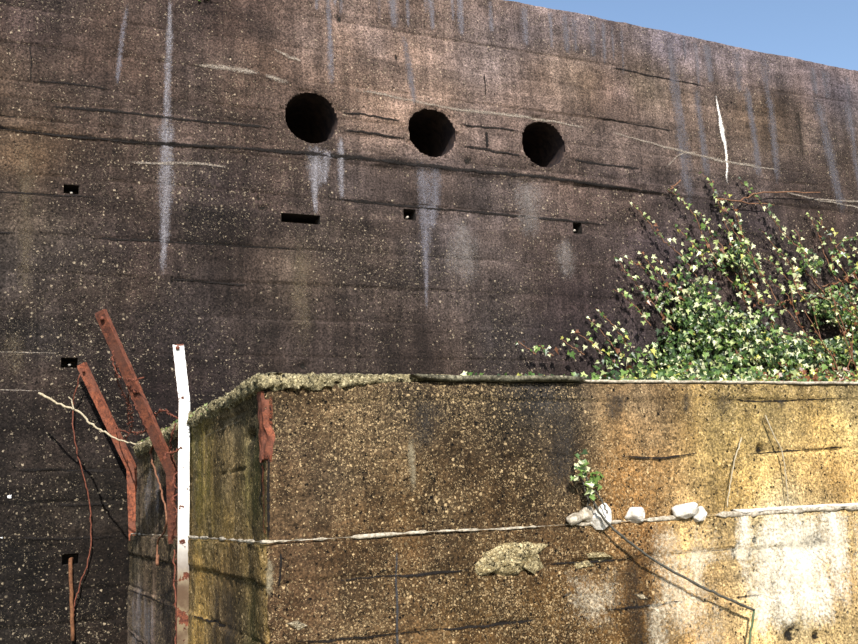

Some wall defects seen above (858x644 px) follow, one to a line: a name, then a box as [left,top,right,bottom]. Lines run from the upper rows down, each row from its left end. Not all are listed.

water stain [136,131,223,260]
water stain [311,141,343,209]
water stain [731,503,858,629]